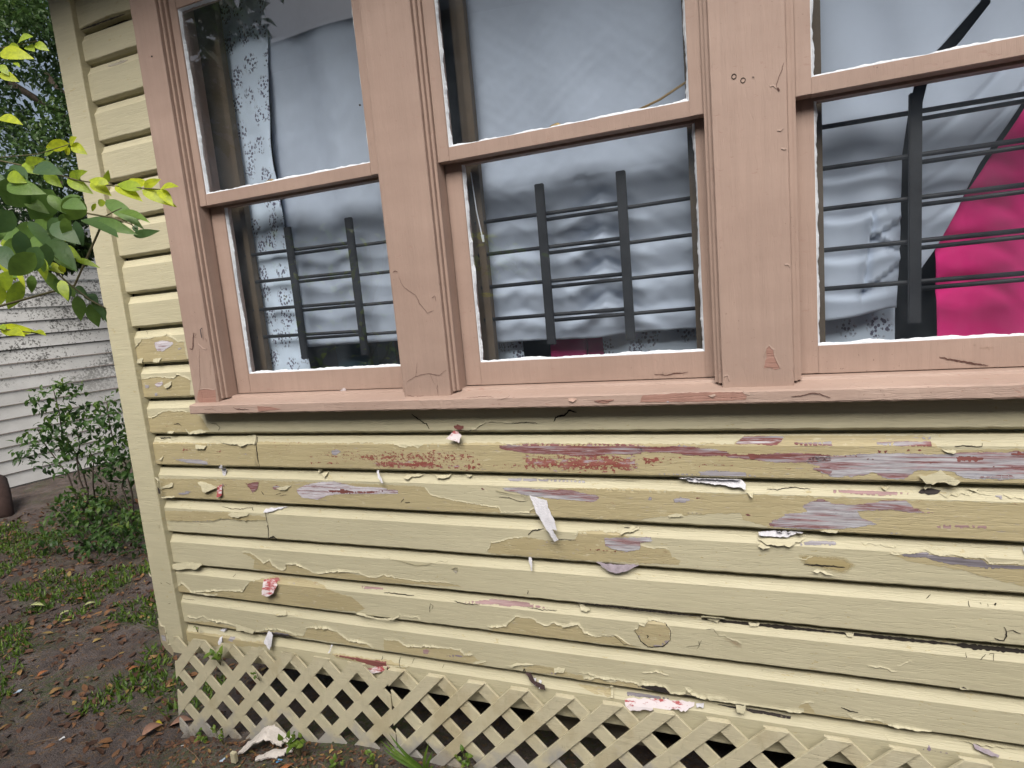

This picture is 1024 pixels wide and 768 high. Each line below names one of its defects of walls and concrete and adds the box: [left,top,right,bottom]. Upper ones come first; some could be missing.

peeling [135,332,1024,586]
peeling [149,550,487,674]
peeling [456,599,956,648]
peeling [506,663,932,741]